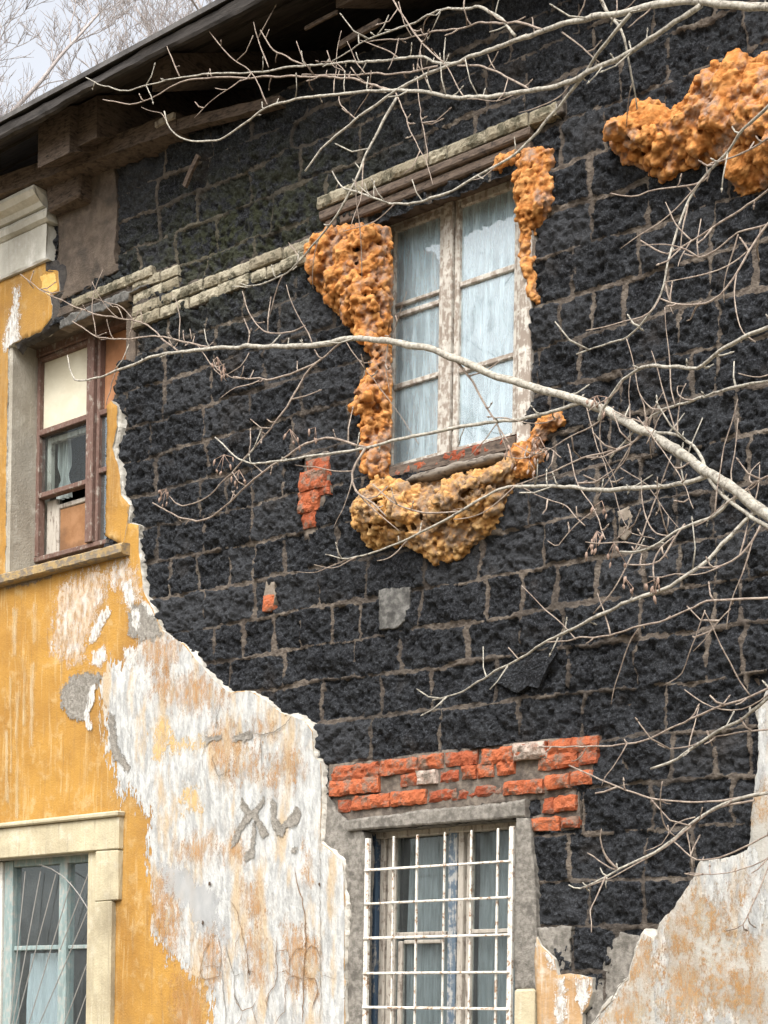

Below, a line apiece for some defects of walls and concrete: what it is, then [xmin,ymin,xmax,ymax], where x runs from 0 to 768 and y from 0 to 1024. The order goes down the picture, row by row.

flaking render [15,0,768,507]
flaking render [47,266,768,1024]